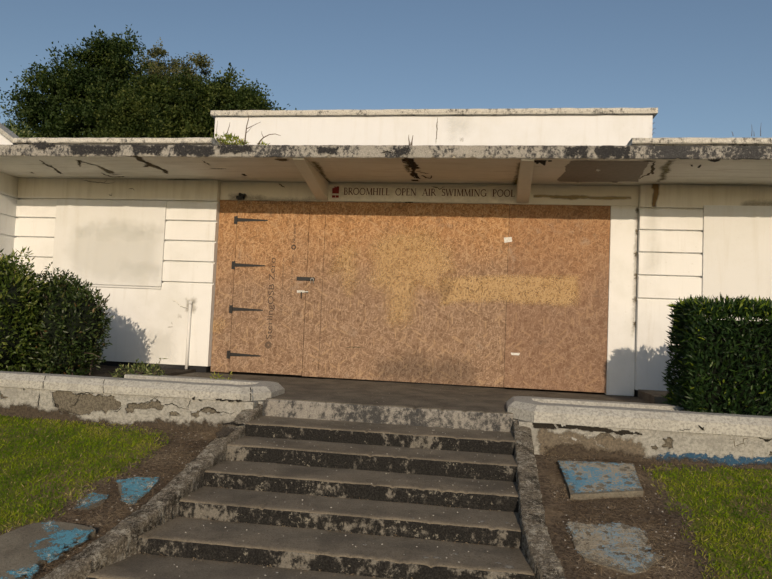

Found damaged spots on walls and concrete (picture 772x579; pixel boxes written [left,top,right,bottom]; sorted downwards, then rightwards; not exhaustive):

peeling [558,160,649,183]
flaking render [52,390,235,418]
flaking render [537,428,673,456]